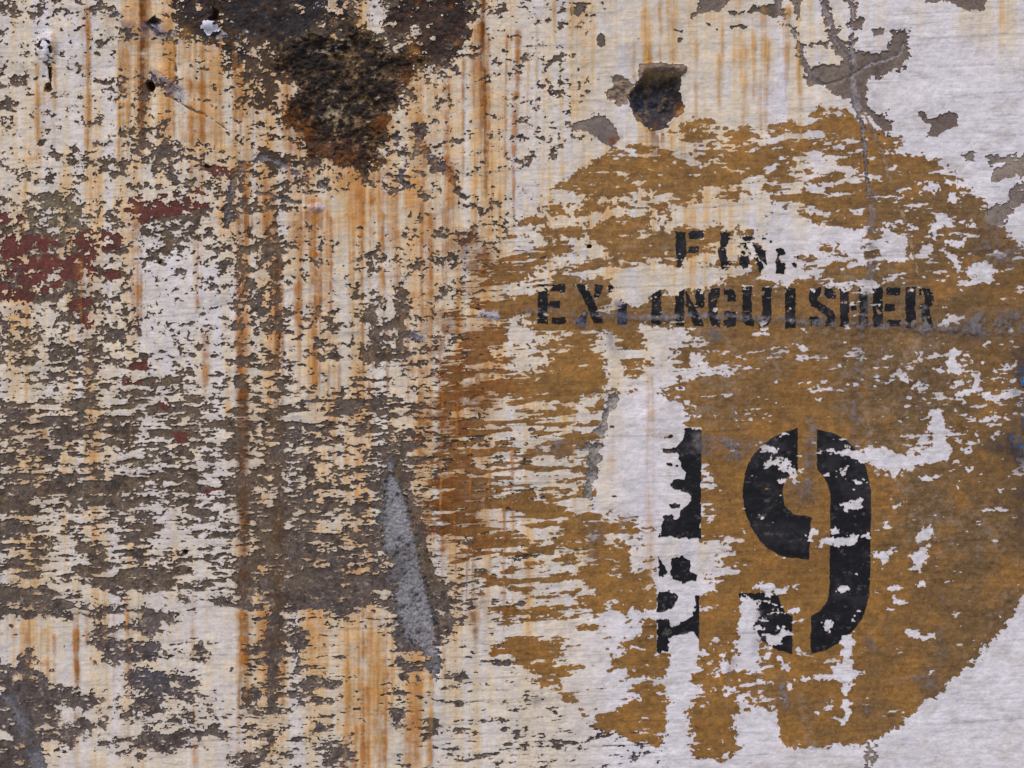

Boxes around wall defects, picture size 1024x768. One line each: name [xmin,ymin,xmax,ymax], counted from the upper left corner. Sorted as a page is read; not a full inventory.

peeling [0,0,145,56]
corrosion [189,112,217,152]
corrosion [462,0,490,129]
corrosion [504,30,528,212]
peeling [486,91,566,160]
peeling [690,0,1024,260]
corrosion [274,200,332,336]
peeling [749,432,804,496]
peeling [796,328,1024,512]
peeling [805,498,959,611]
corrosion [239,612,248,664]
corrosion [345,641,388,765]